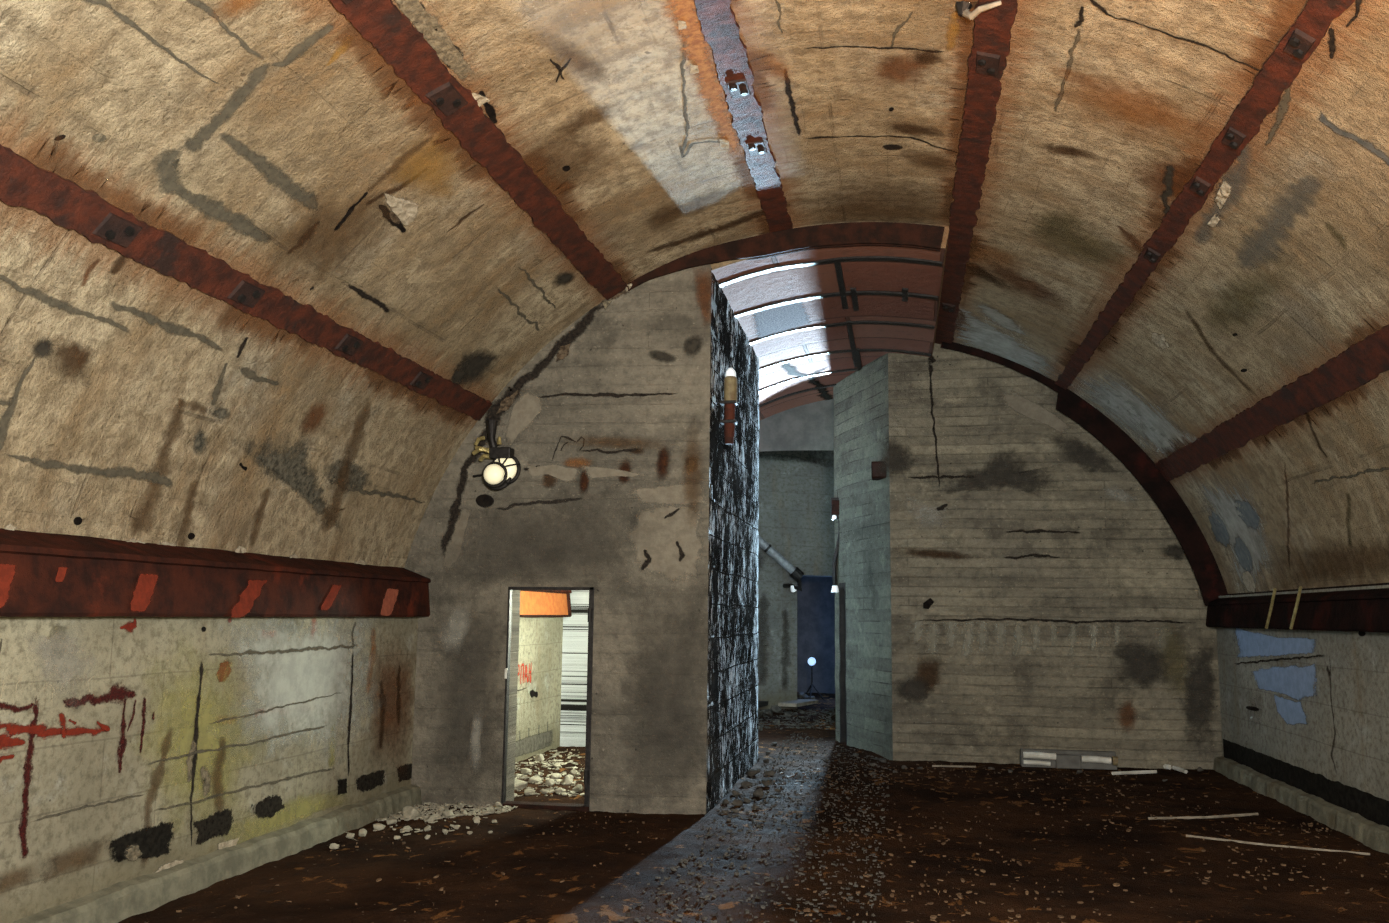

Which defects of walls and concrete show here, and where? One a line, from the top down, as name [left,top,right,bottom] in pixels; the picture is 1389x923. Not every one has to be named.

crack [84,0,333,242]
crack [775,0,955,152]
crack [1054,0,1389,166]
leakage [134,405,181,531]
leakage [239,406,422,545]
crack [441,268,675,551]
crack [909,356,974,486]
leakage [947,453,1048,492]
leakage [1056,437,1113,472]
crack [919,617,1190,625]
leakage [1115,625,1214,735]
peeling [1234,628,1317,725]